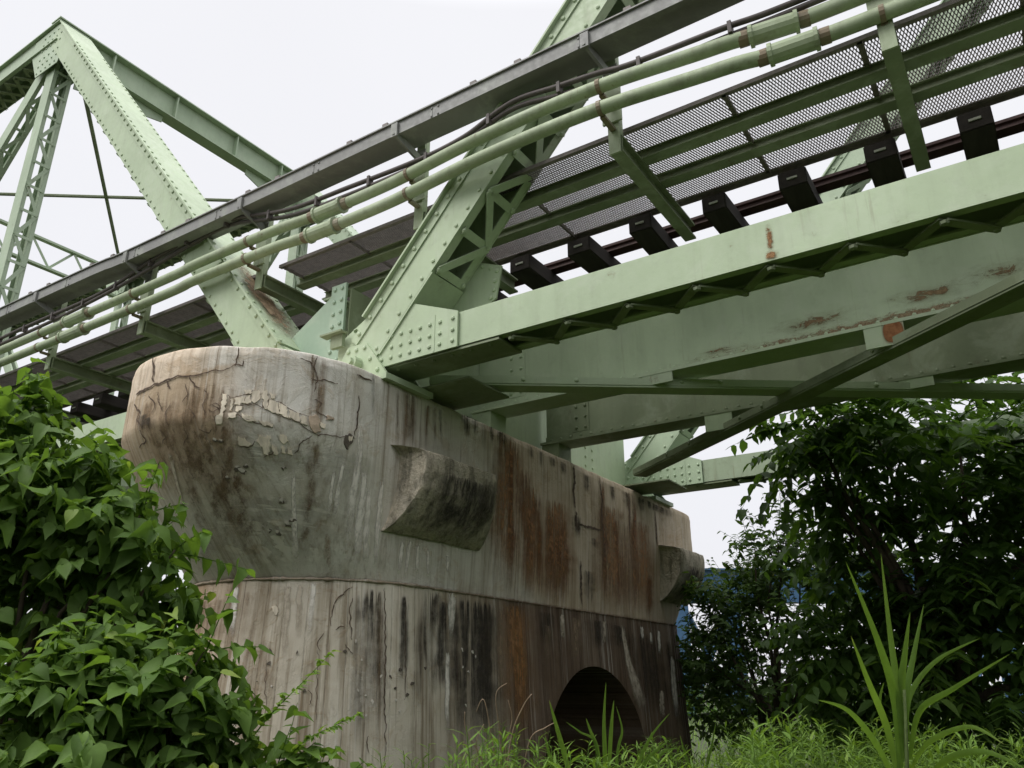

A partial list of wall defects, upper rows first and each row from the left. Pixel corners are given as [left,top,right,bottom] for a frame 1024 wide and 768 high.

corrosion [766,228,777,259]
corrosion [759,285,969,348]
crack [134,347,372,457]
peeling [215,390,334,456]
corrosion [496,439,571,580]
crack [573,466,605,605]
damp [363,591,380,643]
damp [401,593,503,718]